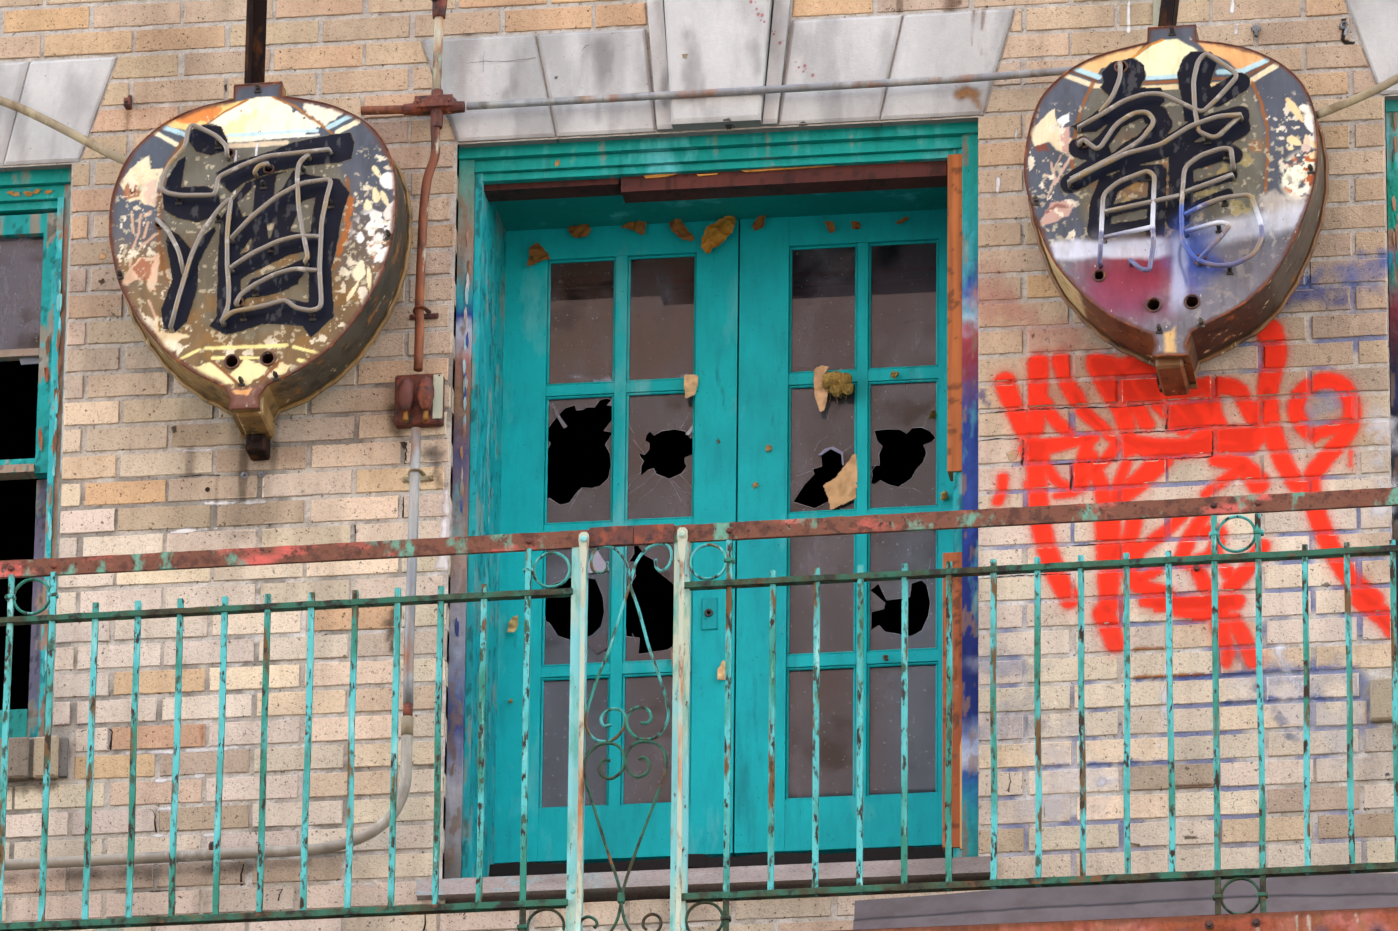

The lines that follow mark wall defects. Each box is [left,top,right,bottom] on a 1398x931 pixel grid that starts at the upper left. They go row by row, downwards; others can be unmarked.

corrosion [955,87,979,102]